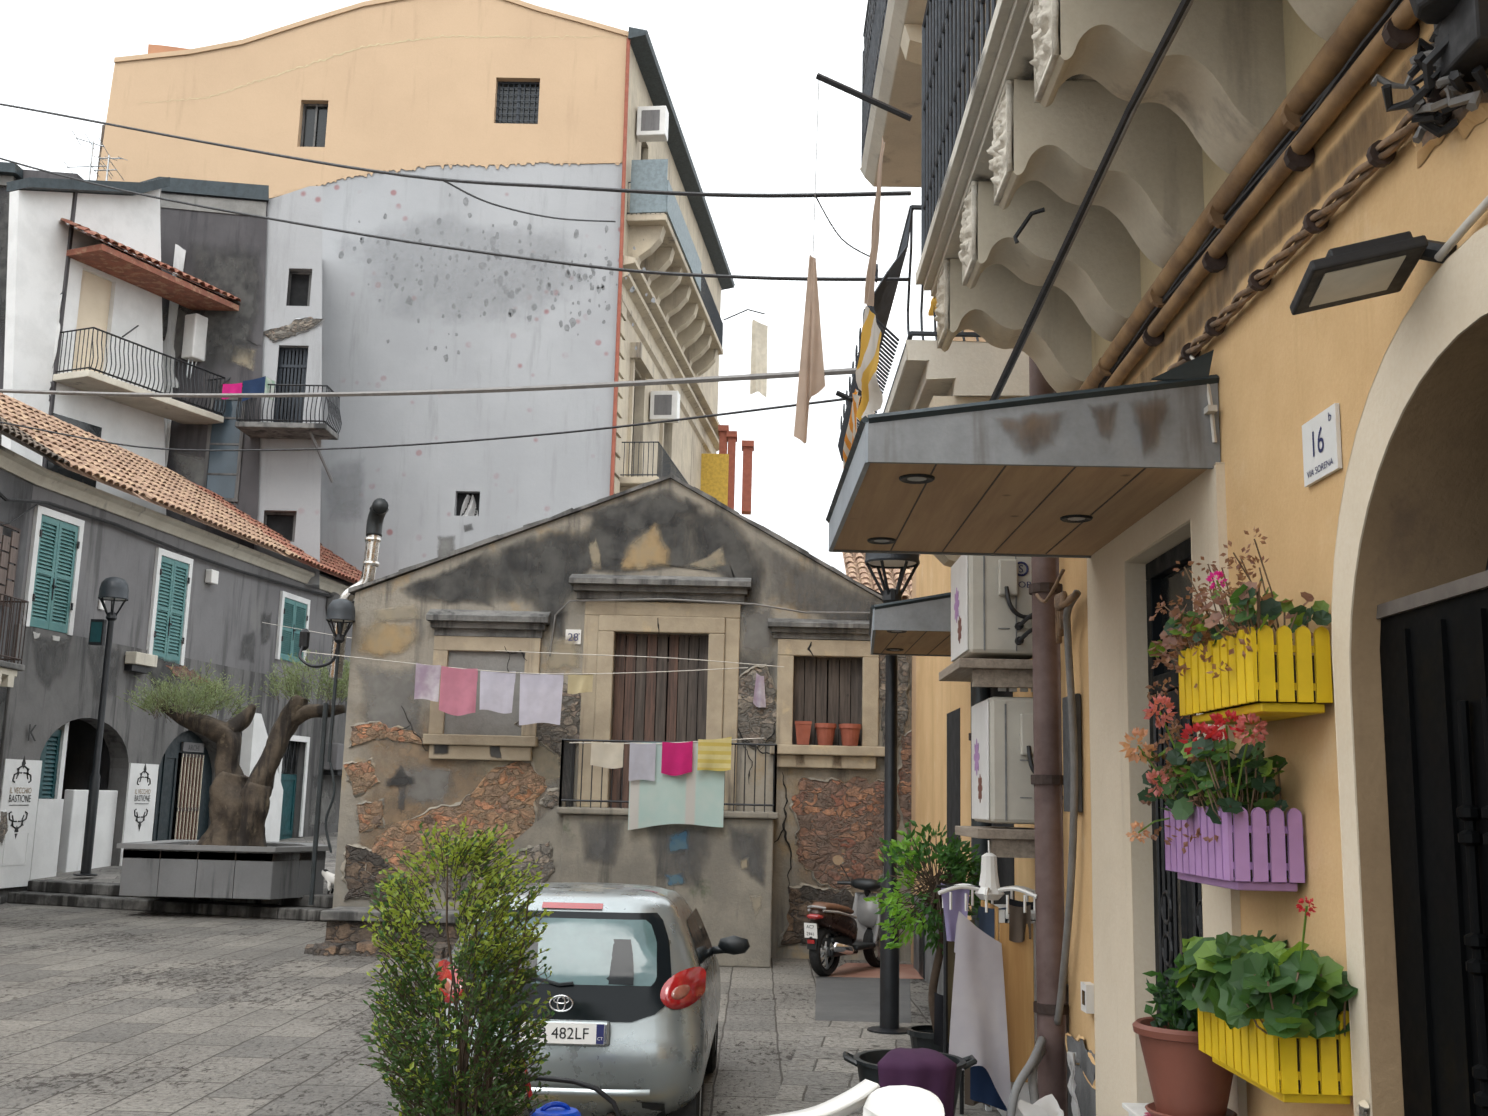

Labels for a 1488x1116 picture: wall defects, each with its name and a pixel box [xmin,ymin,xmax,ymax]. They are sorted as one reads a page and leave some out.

water stain [407,491,878,676]
spalling [340,682,581,905]
spalling [778,655,912,947]